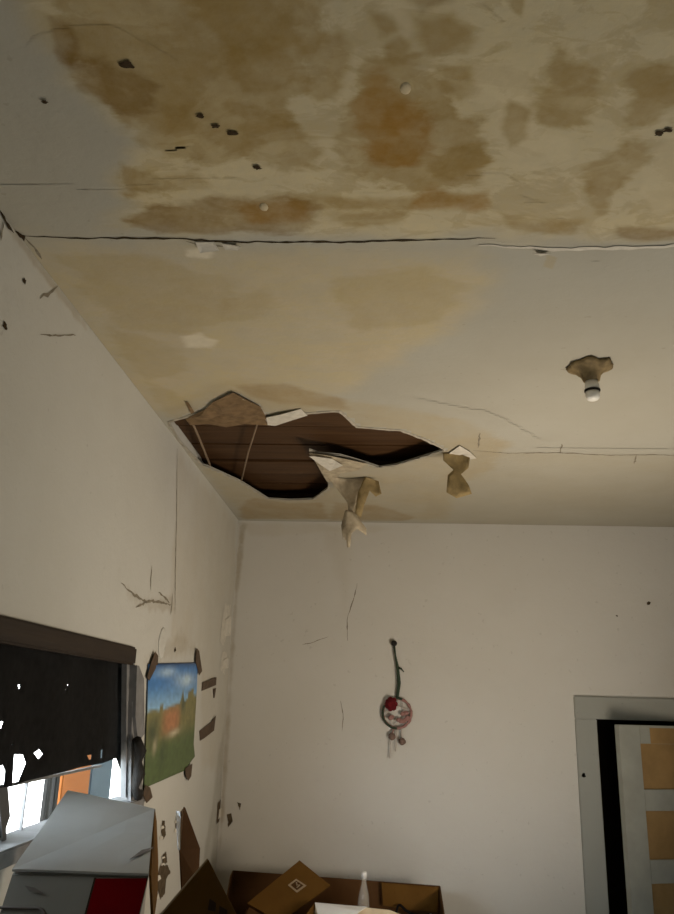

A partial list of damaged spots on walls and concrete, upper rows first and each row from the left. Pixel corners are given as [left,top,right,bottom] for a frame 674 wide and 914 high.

damp [0,0,674,399]
crack [0,211,674,259]
flaking render [266,409,307,426]
flaking render [309,456,343,471]
flaking render [449,446,476,459]
crack [121,558,176,611]
peeling [157,852,170,900]